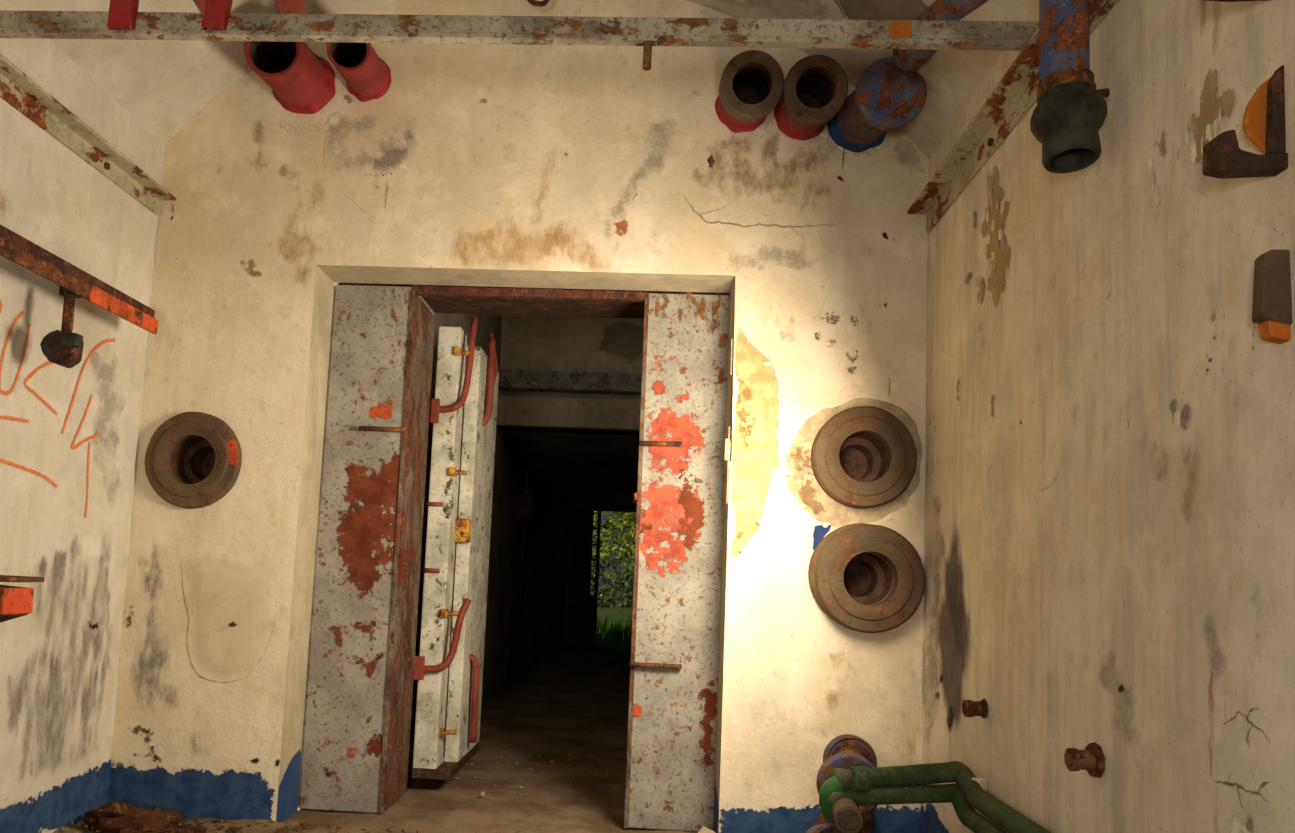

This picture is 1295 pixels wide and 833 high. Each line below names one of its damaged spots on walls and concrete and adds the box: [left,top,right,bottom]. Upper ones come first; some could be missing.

peeling [1148,69,1235,205]
crack [684,196,834,228]
peeling [965,167,1010,306]
spalling [725,326,922,558]
water stain [9,552,108,769]
crack [1214,773,1270,811]
crack [1223,707,1270,748]